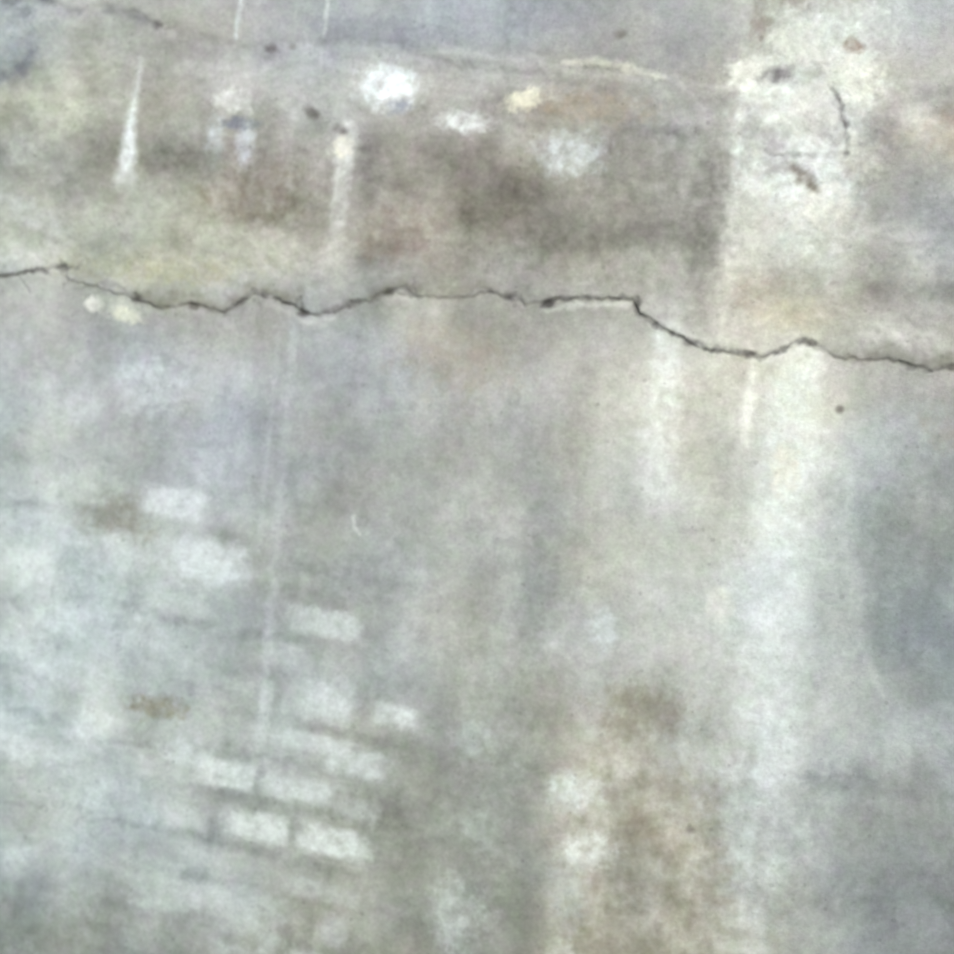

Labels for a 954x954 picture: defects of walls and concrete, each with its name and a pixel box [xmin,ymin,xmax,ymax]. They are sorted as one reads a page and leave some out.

crack [0,0,177,34]
crack [204,32,281,55]
crack [313,26,564,83]
leakage [109,54,146,196]
leakage [323,118,362,269]
leakage [471,107,731,293]
crack [0,258,954,376]